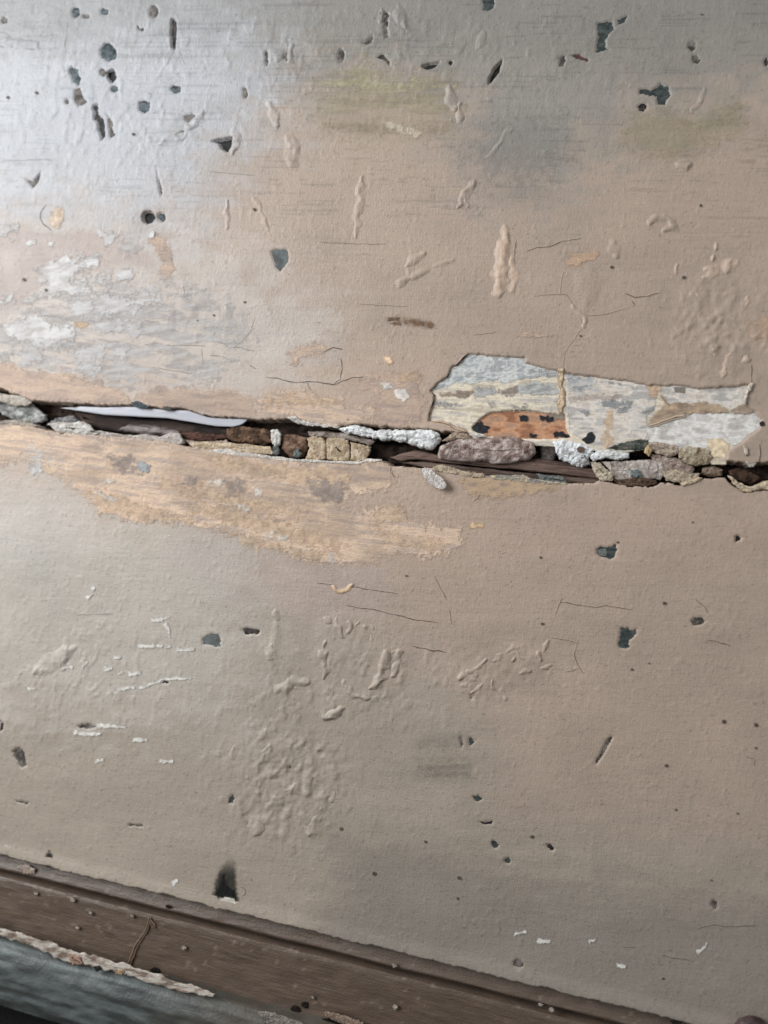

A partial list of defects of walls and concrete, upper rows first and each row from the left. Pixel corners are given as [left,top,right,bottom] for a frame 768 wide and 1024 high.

peeling [72,8,109,19]
peeling [65,67,115,138]
peeling [99,43,119,92]
peeling [139,101,150,114]
peeling [0,208,765,464]
crack [0,390,768,502]
peeling [0,423,484,567]